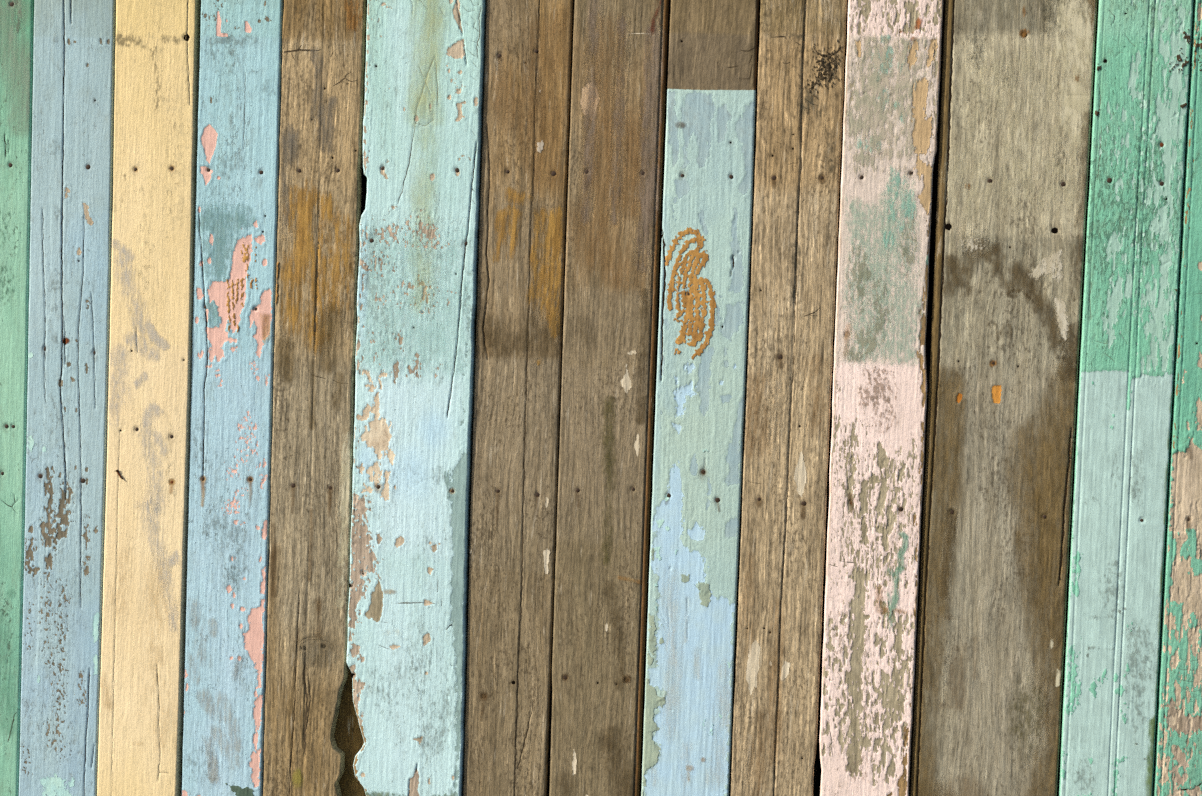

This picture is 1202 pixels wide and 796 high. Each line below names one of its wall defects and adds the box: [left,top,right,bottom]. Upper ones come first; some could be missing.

peeling [24,465,98,759]
peeling [200,124,220,185]
peeling [195,220,272,387]
peeling [221,411,268,540]
peeling [226,556,266,788]
peeling [363,0,392,179]
peeling [347,206,472,796]
peeling [446,0,478,121]
peeling [820,380,924,796]
peeling [844,0,942,407]
peeling [1060,0,1202,796]